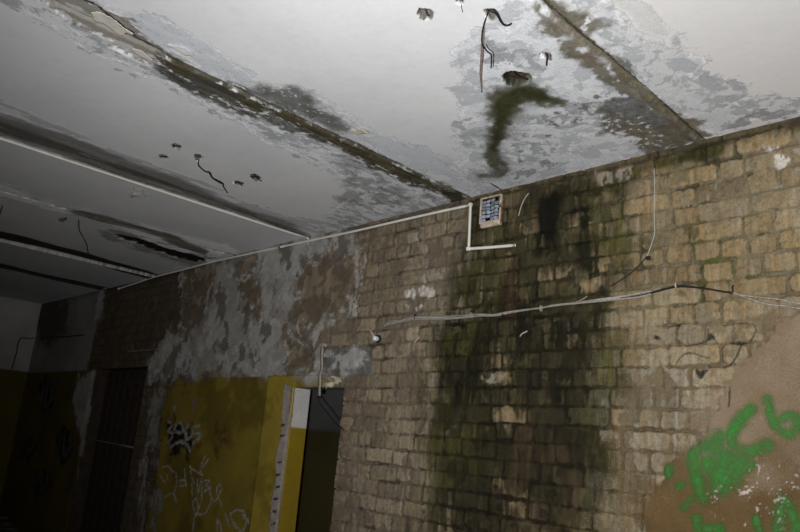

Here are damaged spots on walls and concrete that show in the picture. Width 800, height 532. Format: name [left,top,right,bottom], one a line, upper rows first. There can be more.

water stain [155,59,447,197]
peeling [0,0,800,235]
water stain [461,0,800,275]
peeling [0,183,264,342]
water stain [421,256,628,532]